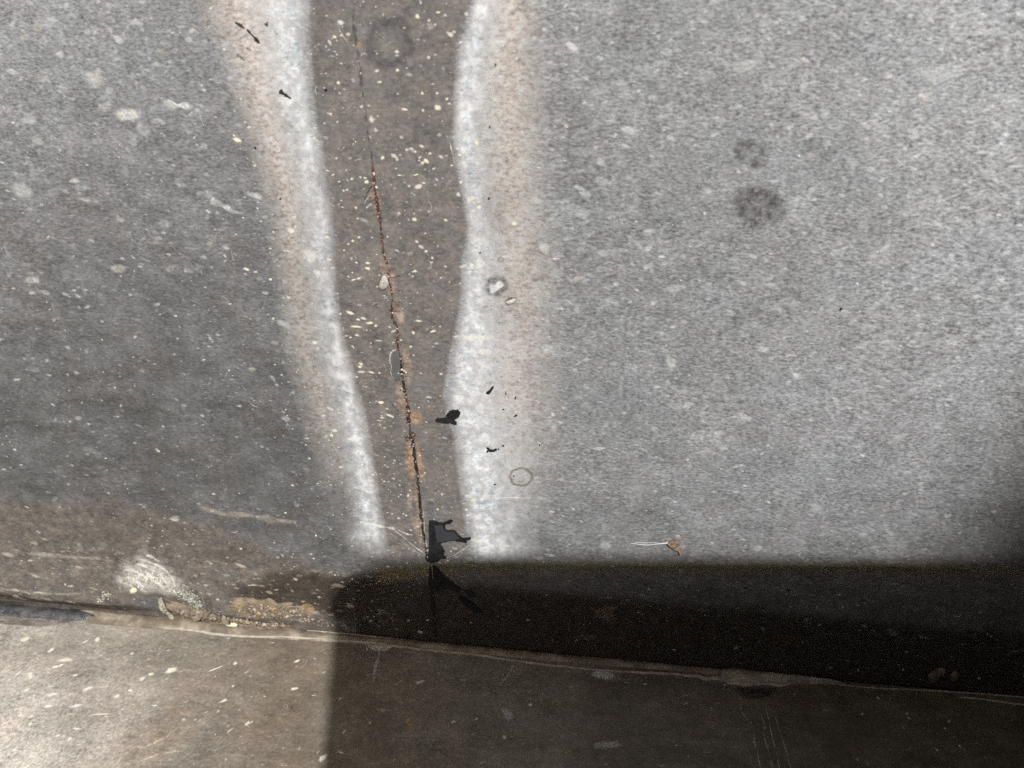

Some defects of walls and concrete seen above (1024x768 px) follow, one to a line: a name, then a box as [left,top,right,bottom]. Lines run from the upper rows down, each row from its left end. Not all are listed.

crack [365,156,437,637]